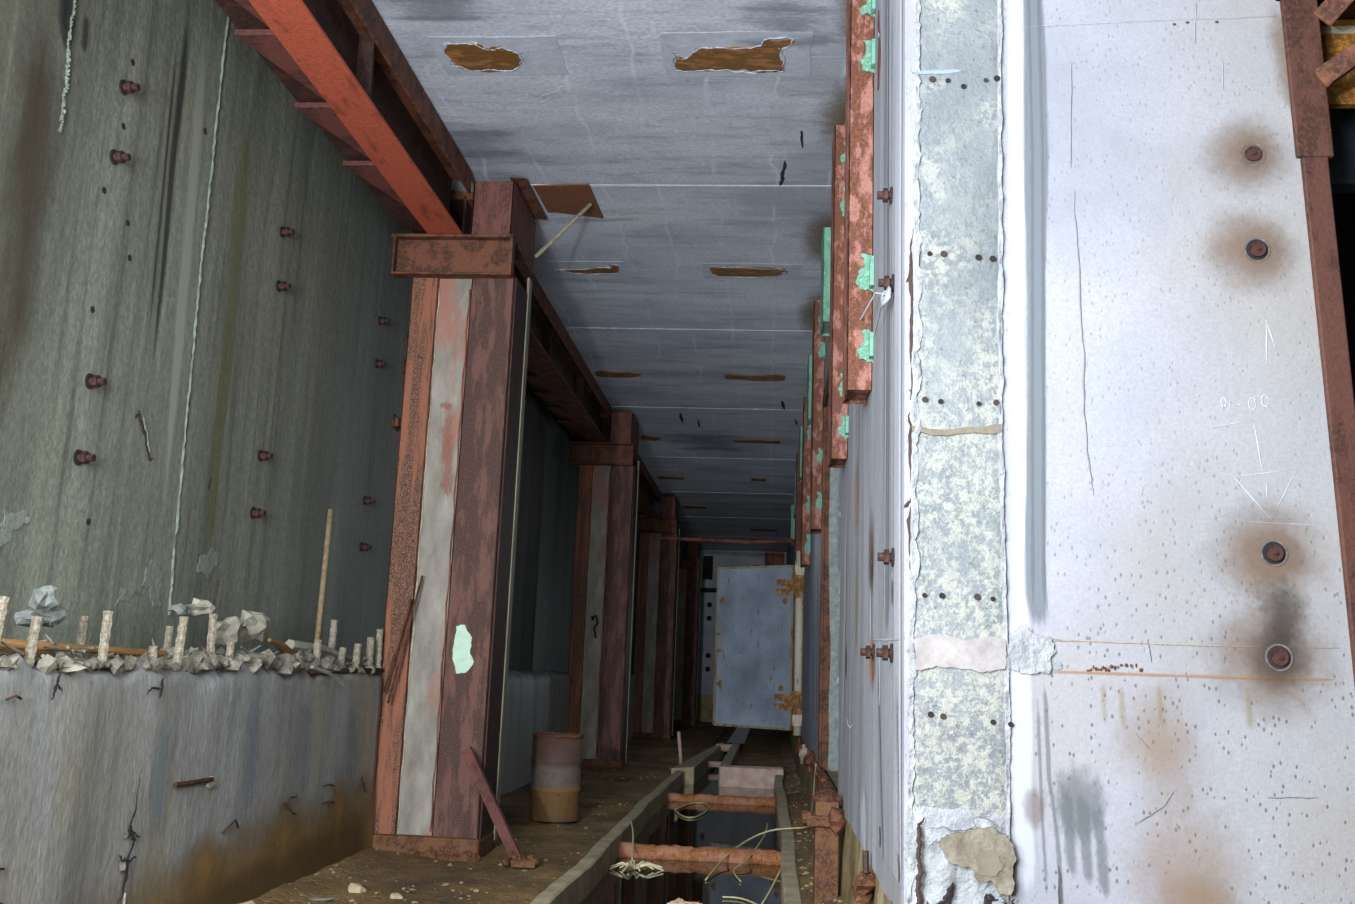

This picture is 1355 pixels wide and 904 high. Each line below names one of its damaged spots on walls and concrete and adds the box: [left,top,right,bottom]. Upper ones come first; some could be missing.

peeling [428,36,569,75]
peeling [660,31,814,77]
corrosion [1225,132,1266,173]
peeling [702,263,802,280]
corrosion [1222,229,1279,273]
spalling [838,0,1016,904]
corrosion [1239,532,1301,584]
spalling [0,560,235,668]
corrosion [1057,597,1328,694]
crack [117,780,140,904]
crack [915,816,1015,904]
crack [1056,865,1064,904]